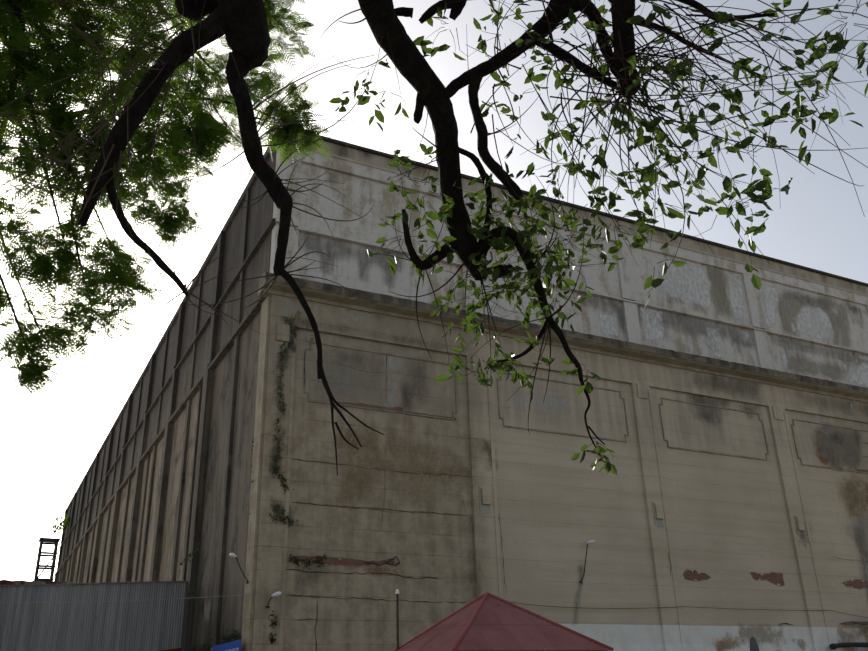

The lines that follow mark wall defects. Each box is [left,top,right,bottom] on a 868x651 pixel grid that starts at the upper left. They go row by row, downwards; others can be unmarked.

spalling [289,555,399,567]
spalling [683,569,711,582]
spalling [750,572,785,586]
spalling [842,579,868,589]